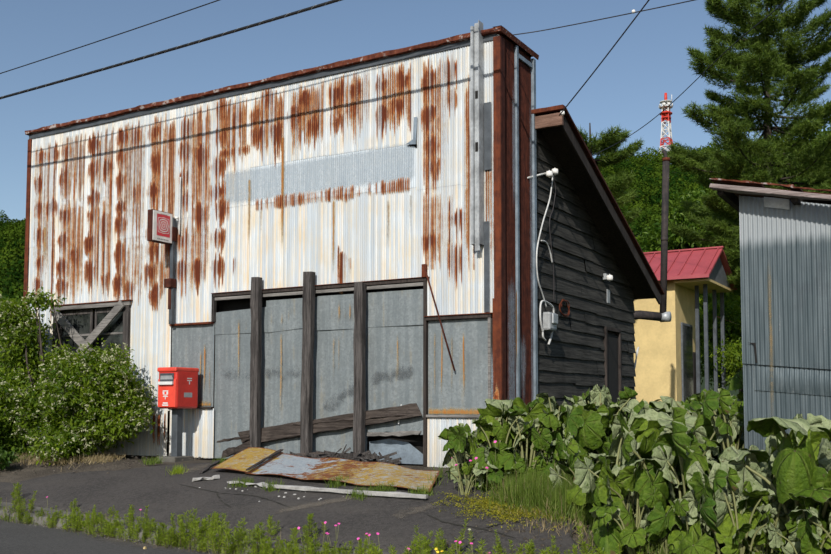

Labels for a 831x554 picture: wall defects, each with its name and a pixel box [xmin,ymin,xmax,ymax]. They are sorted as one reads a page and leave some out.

rust [34,62,411,311]
rust [421,55,474,287]